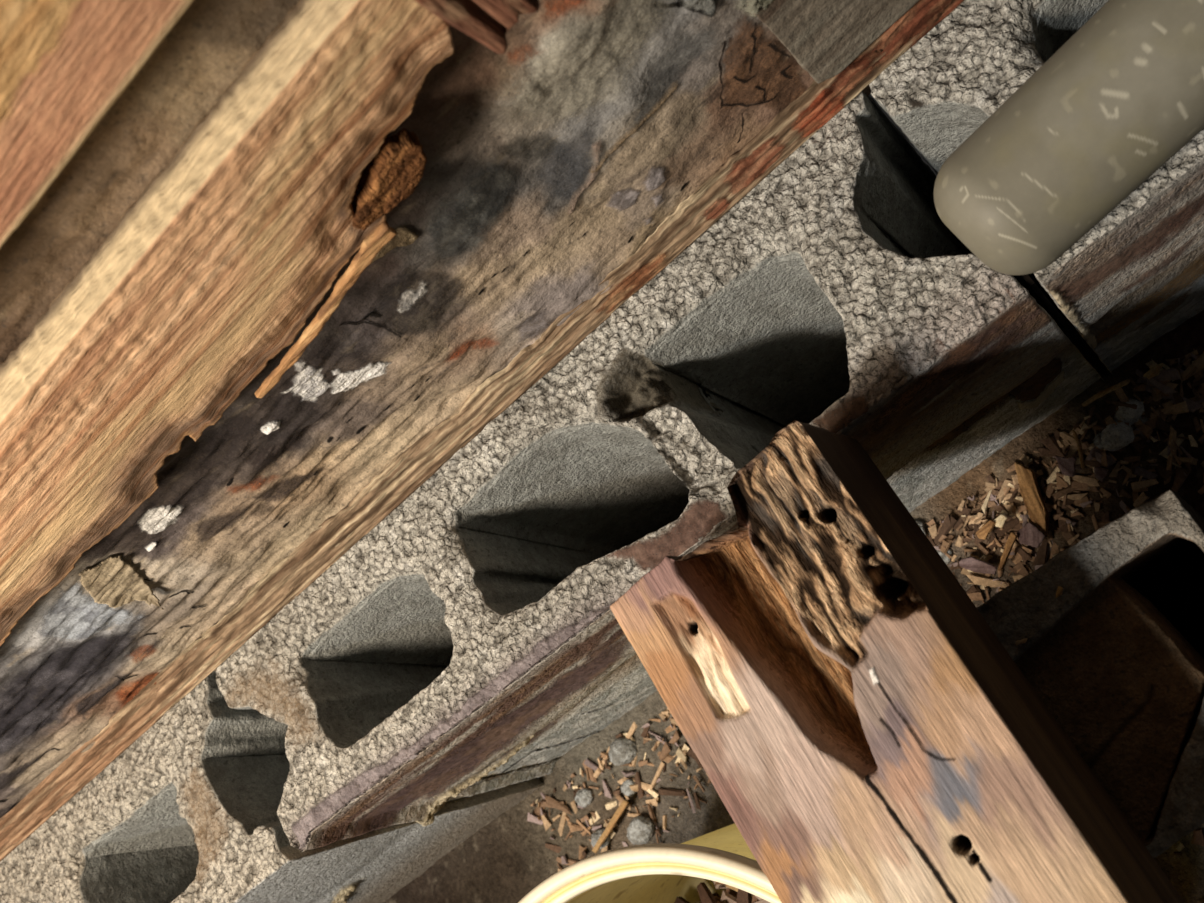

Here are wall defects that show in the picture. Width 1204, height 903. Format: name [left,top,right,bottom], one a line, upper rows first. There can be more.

leakage [634,32,712,128]
leakage [429,134,594,258]
corrosion [703,138,786,220]
leakage [377,271,462,336]
leakage [111,336,388,555]
leakage [608,501,726,570]
leakage [0,752,47,790]
leakage [0,616,156,754]
leakage [351,631,623,838]
crack [877,682,954,761]
crack [865,775,956,903]
crack [972,850,991,882]